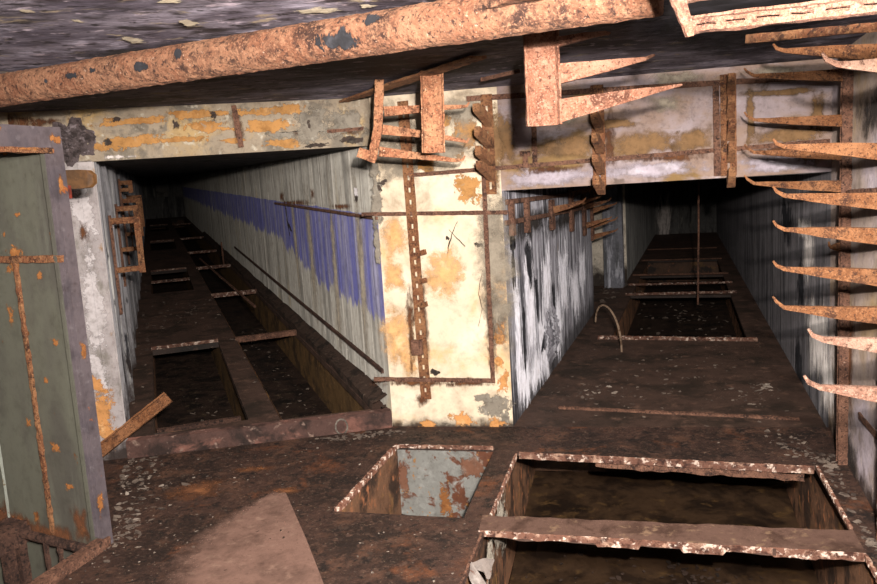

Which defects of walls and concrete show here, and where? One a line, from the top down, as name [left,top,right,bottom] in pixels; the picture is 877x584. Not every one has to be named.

rust [315,25,363,52]
rust [363,14,381,26]
rust [134,61,148,72]
peeling [91,103,369,152]
rust [523,166,576,174]
water stain [479,199,582,341]
peeling [69,188,116,439]
rust [406,285,429,371]
rust [391,377,482,386]
rust [398,460,409,501]
rust [439,482,453,517]
rust [0,501,90,540]